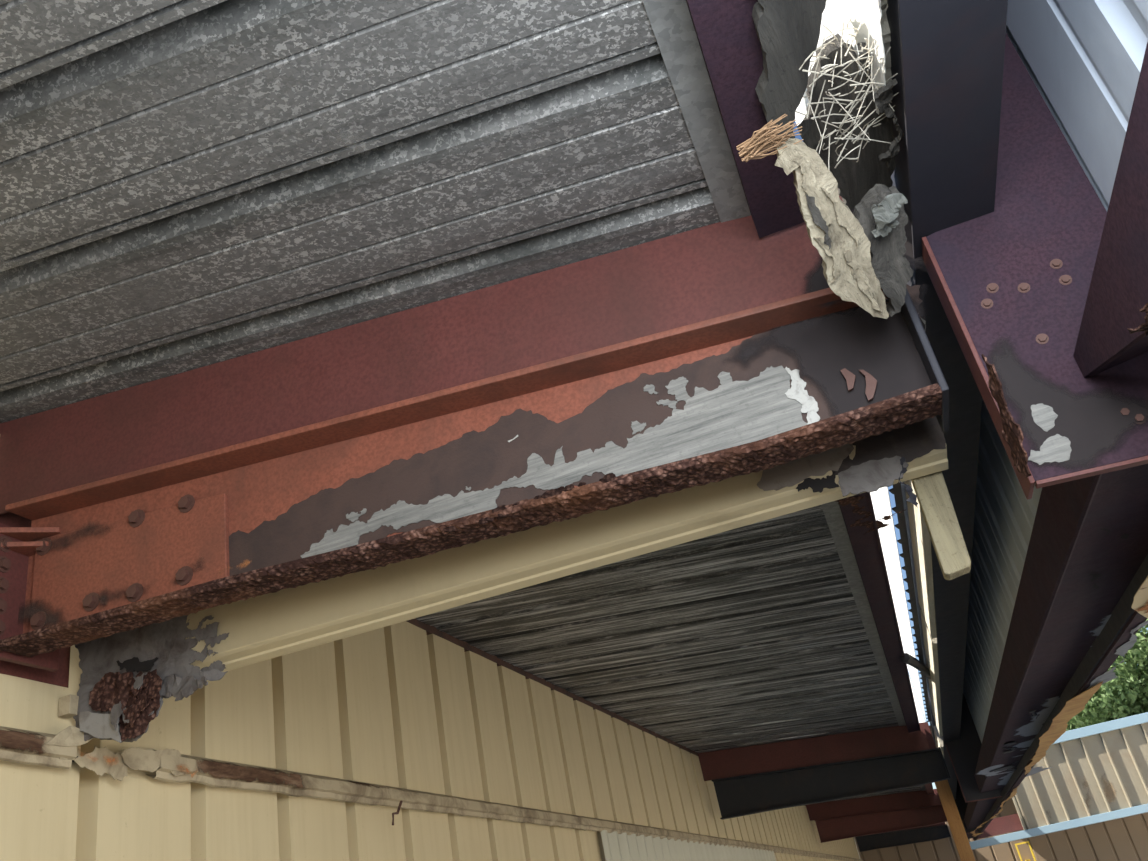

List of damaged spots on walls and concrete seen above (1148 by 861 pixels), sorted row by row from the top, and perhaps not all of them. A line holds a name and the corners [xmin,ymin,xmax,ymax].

peeling [229,331,834,576]
rust [757,416,946,535]
peeling [1028,403,1072,465]
rust [110,669,163,730]
peeling [977,696,1060,785]
peeling [1085,620,1148,691]